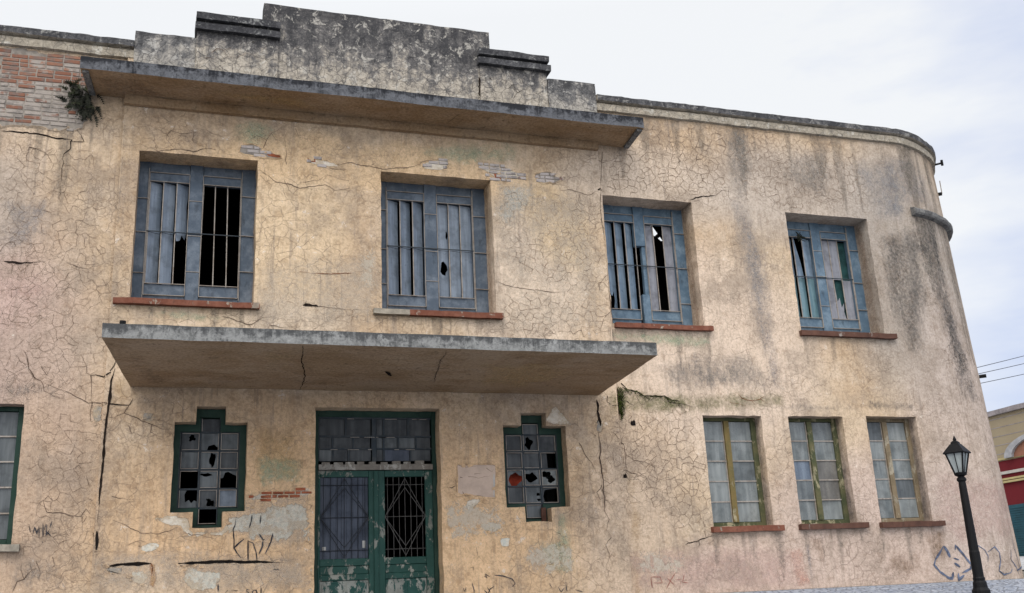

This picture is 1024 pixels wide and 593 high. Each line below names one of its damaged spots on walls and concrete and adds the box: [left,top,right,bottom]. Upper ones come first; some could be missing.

flaking render [0,46,102,133]
flaking render [238,143,282,160]
crack [255,128,438,203]
flaking render [478,162,566,185]
crack [497,127,872,340]
crack [0,110,222,592]
crack [223,264,366,389]
peeling [155,488,312,545]
crack [577,383,711,572]